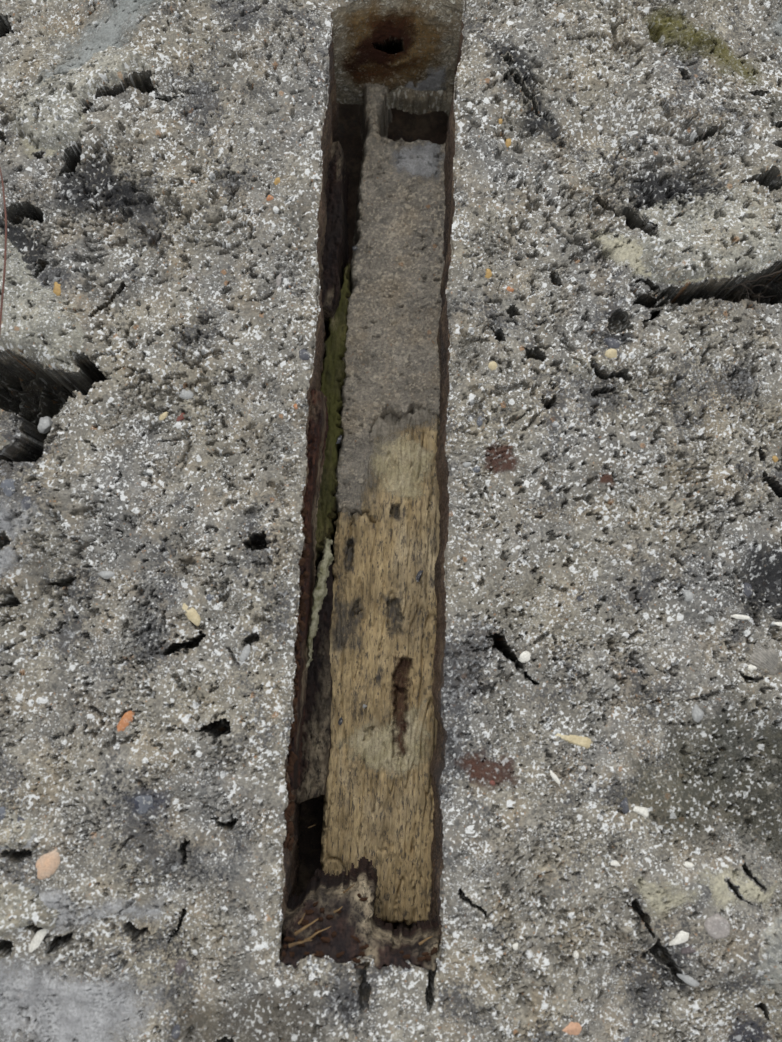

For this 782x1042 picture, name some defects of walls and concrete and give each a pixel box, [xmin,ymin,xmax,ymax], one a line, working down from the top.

corrosion [344,3,442,92]
spalling [0,349,108,463]
crack [627,898,685,984]